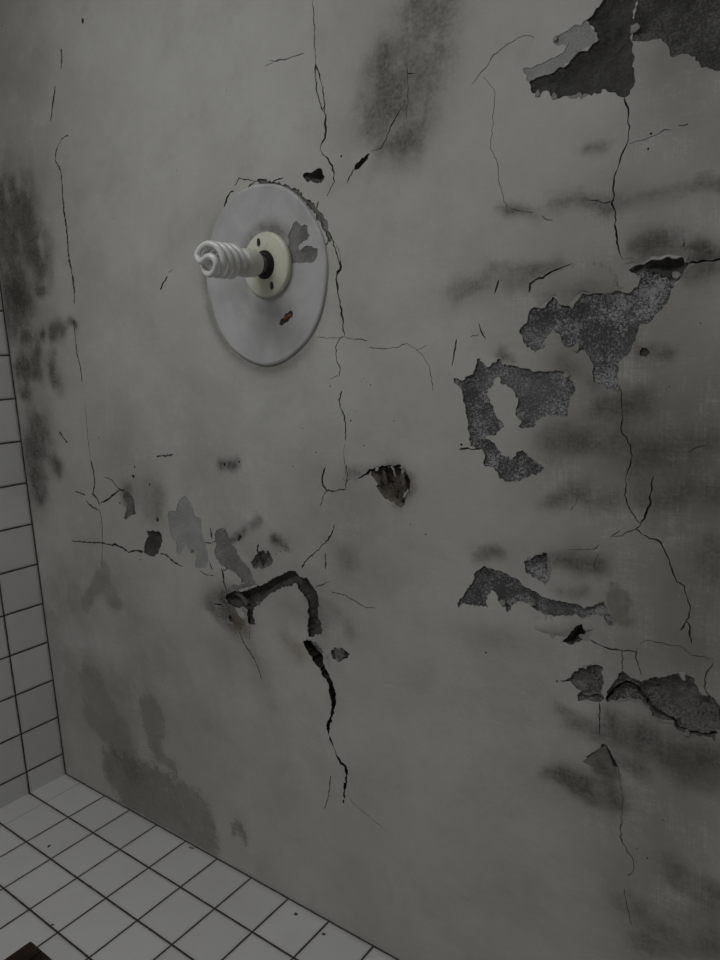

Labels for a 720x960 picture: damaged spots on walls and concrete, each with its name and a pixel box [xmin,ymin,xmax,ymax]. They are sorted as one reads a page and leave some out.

flaking render [522,0,720,100]
water stain [0,178,77,398]
crack [50,49,82,380]
crack [224,2,486,506]
flaking render [519,257,688,391]
crack [591,98,688,259]
flaking render [454,358,575,482]
peeling [140,496,286,584]
crack [59,405,386,831]
flaking render [457,551,614,645]
crack [568,387,719,735]
flaking render [556,664,720,742]